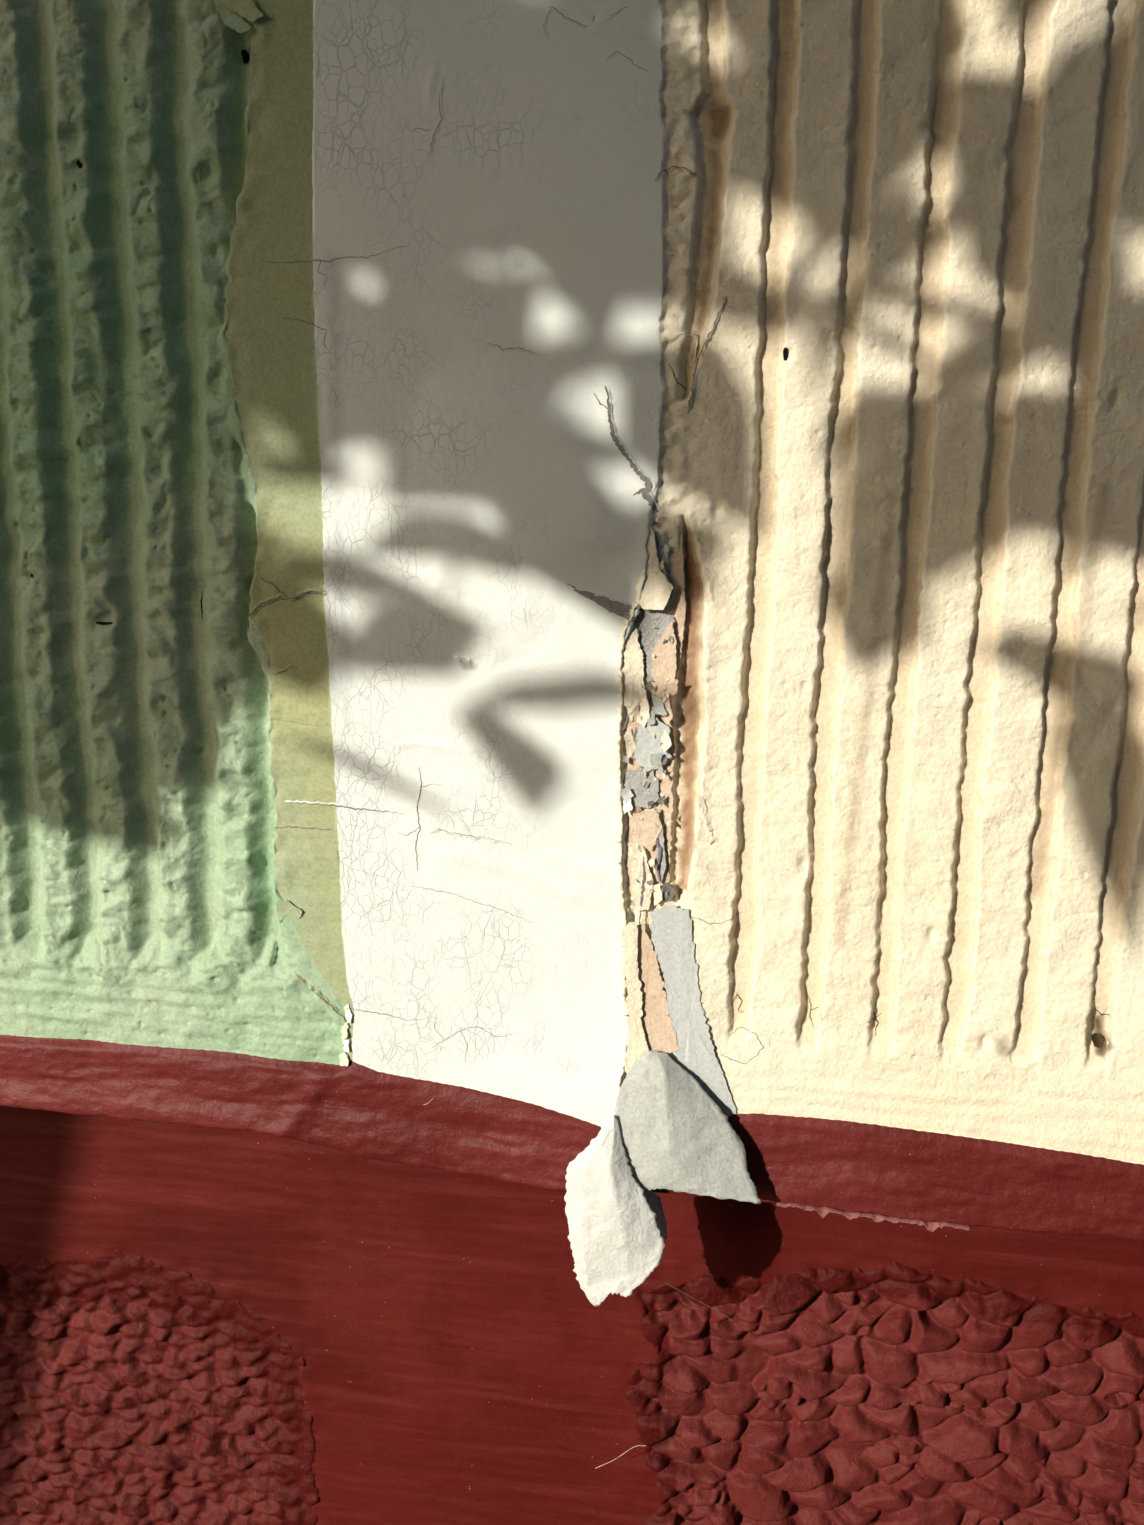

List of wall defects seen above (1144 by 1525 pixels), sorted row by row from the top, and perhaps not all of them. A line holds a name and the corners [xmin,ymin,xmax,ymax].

crack [544,6,649,74]
crack [411,76,445,158]
crack [263,244,410,288]
crack [485,342,546,357]
crack [594,385,661,513]
crack [567,584,643,622]
crack [275,771,532,968]
peeling [564,507,970,1307]
crack [294,970,515,1055]